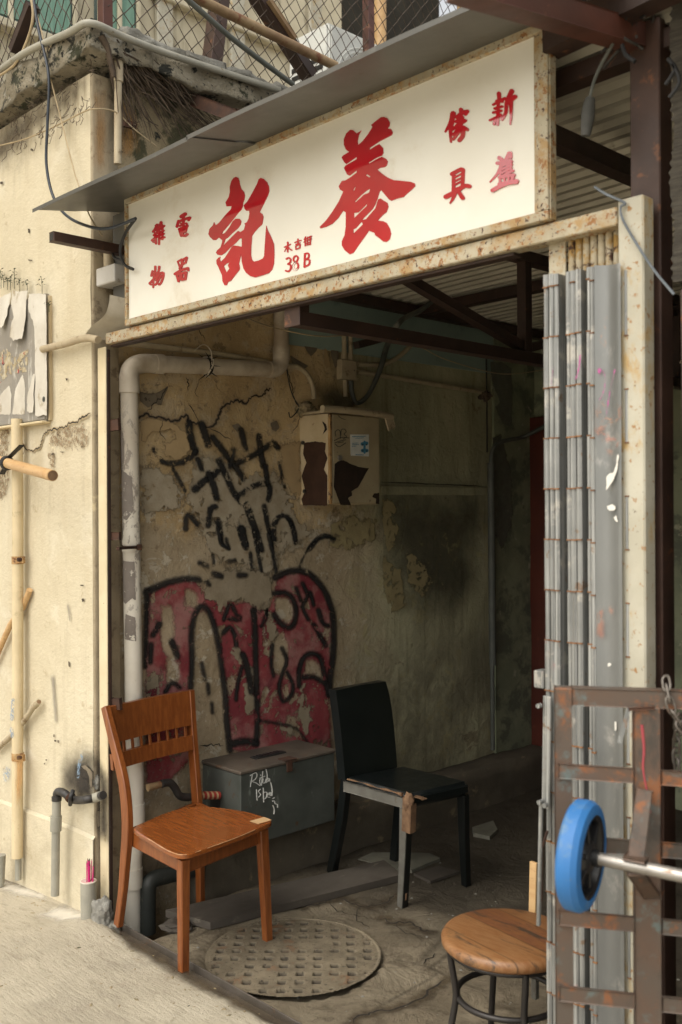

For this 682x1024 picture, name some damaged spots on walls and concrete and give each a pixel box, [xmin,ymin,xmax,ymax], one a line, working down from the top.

water stain [0,90,76,155]
crack [23,413,90,454]
crack [119,374,300,440]
peeling [328,498,433,613]